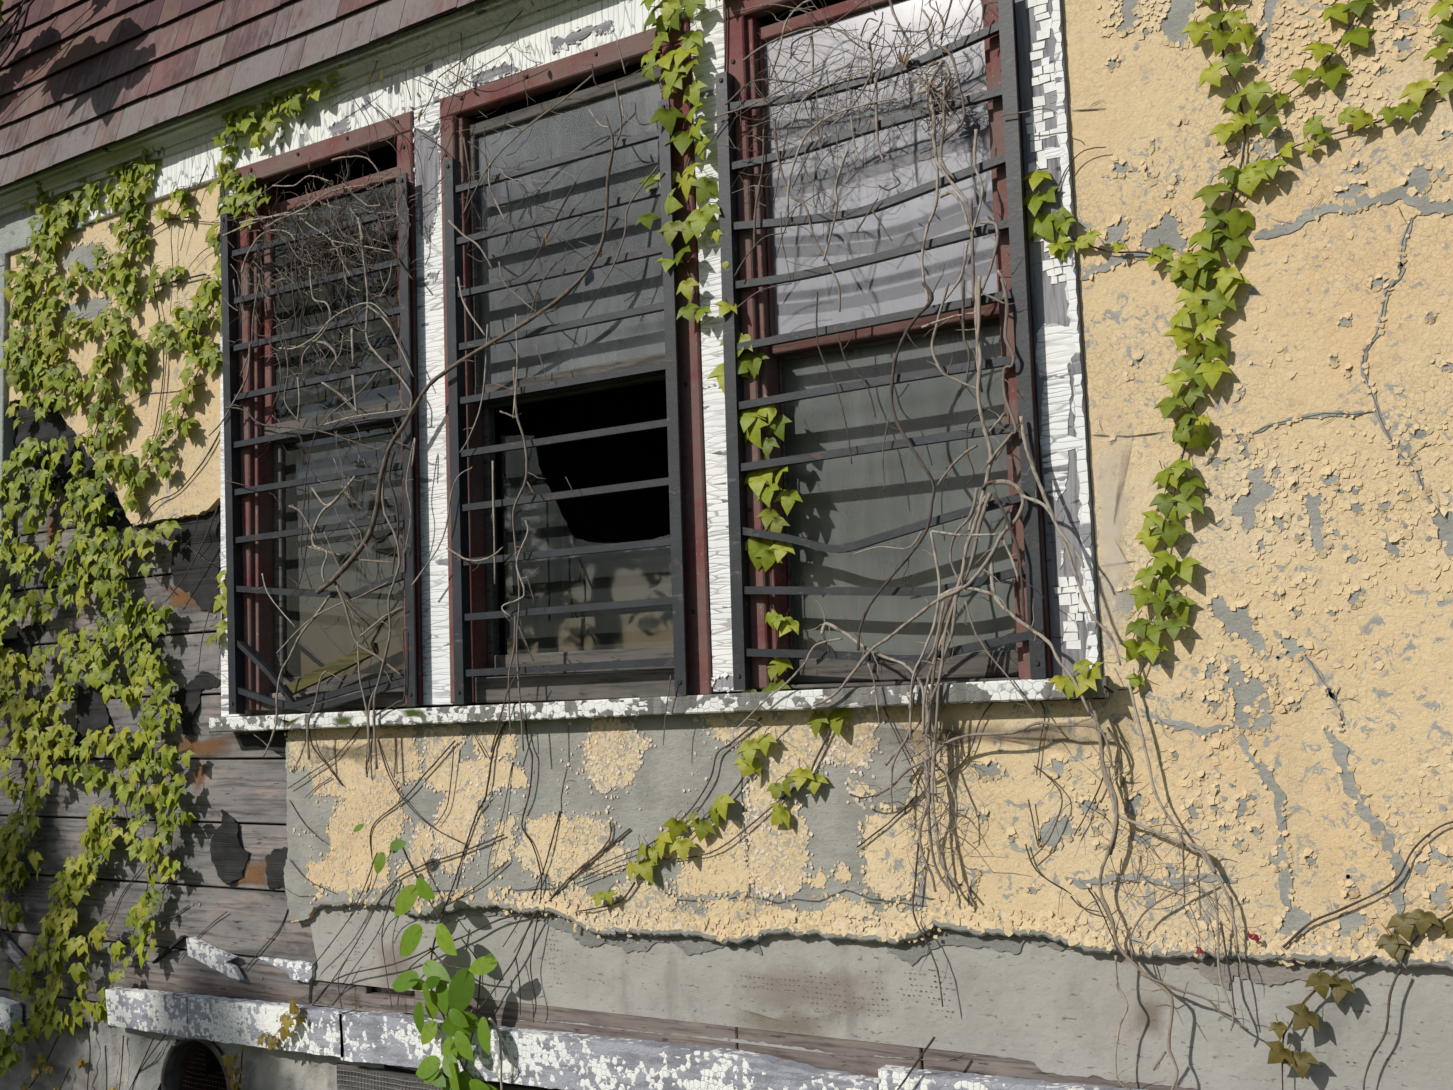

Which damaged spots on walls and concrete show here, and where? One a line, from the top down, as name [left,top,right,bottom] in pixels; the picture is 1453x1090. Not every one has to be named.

peeling [549,19,613,54]
peeling [1025,0,1064,173]
peeling [1033,233,1072,284]
crack [1080,238,1190,280]
peeling [1100,138,1192,260]
crack [1096,414,1166,437]
crack [1252,187,1453,521]
peeling [1006,387,1453,990]
peeling [283,707,985,956]
crack [1139,708,1295,912]
crack [1300,648,1413,931]
flaking render [884,928,1072,966]